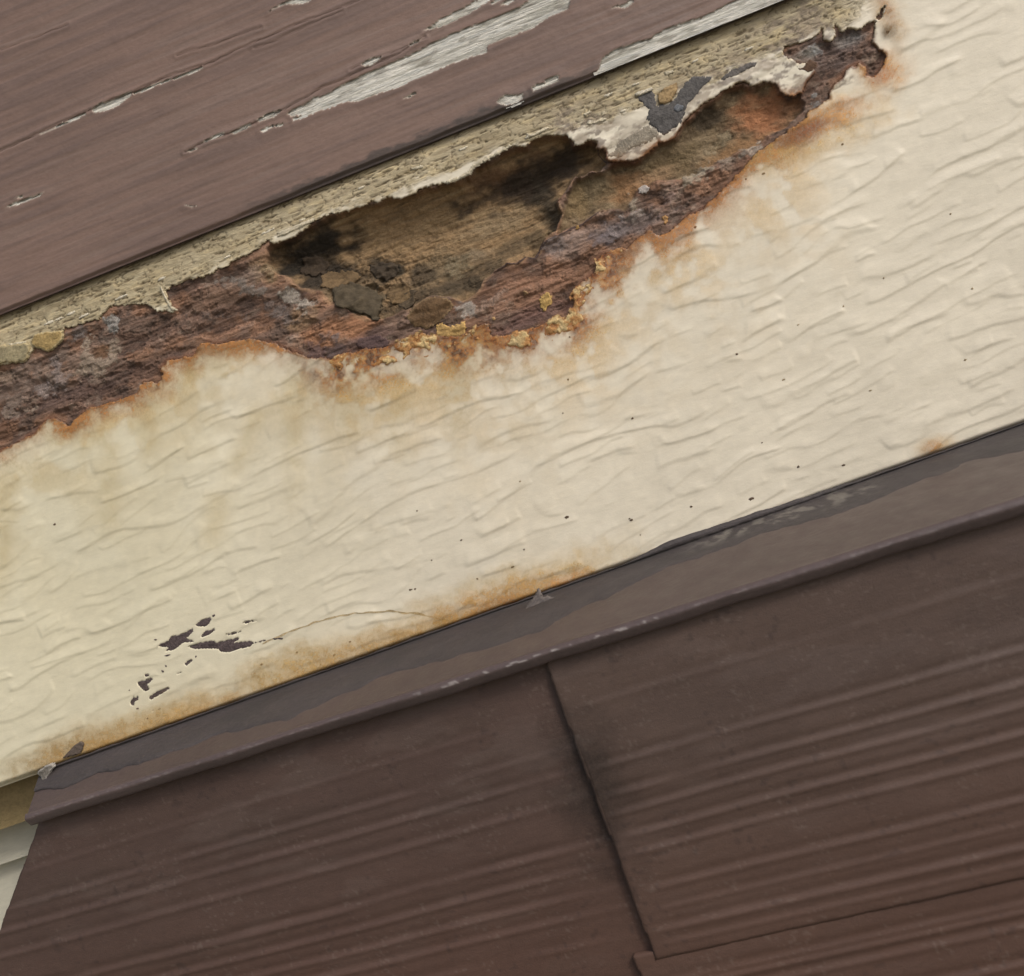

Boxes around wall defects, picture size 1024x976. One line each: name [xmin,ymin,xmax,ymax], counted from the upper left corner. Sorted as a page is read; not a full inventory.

peeling [593,0,782,76]
peeling [56,67,202,128]
peeling [205,0,570,142]
peeling [632,46,757,135]
peeling [798,60,817,72]
leakage [608,125,659,158]
peeling [539,292,552,311]
peeling [0,311,90,364]
peeling [356,335,389,349]
peeling [436,321,467,337]
leakage [263,610,449,644]
peeling [128,615,283,720]